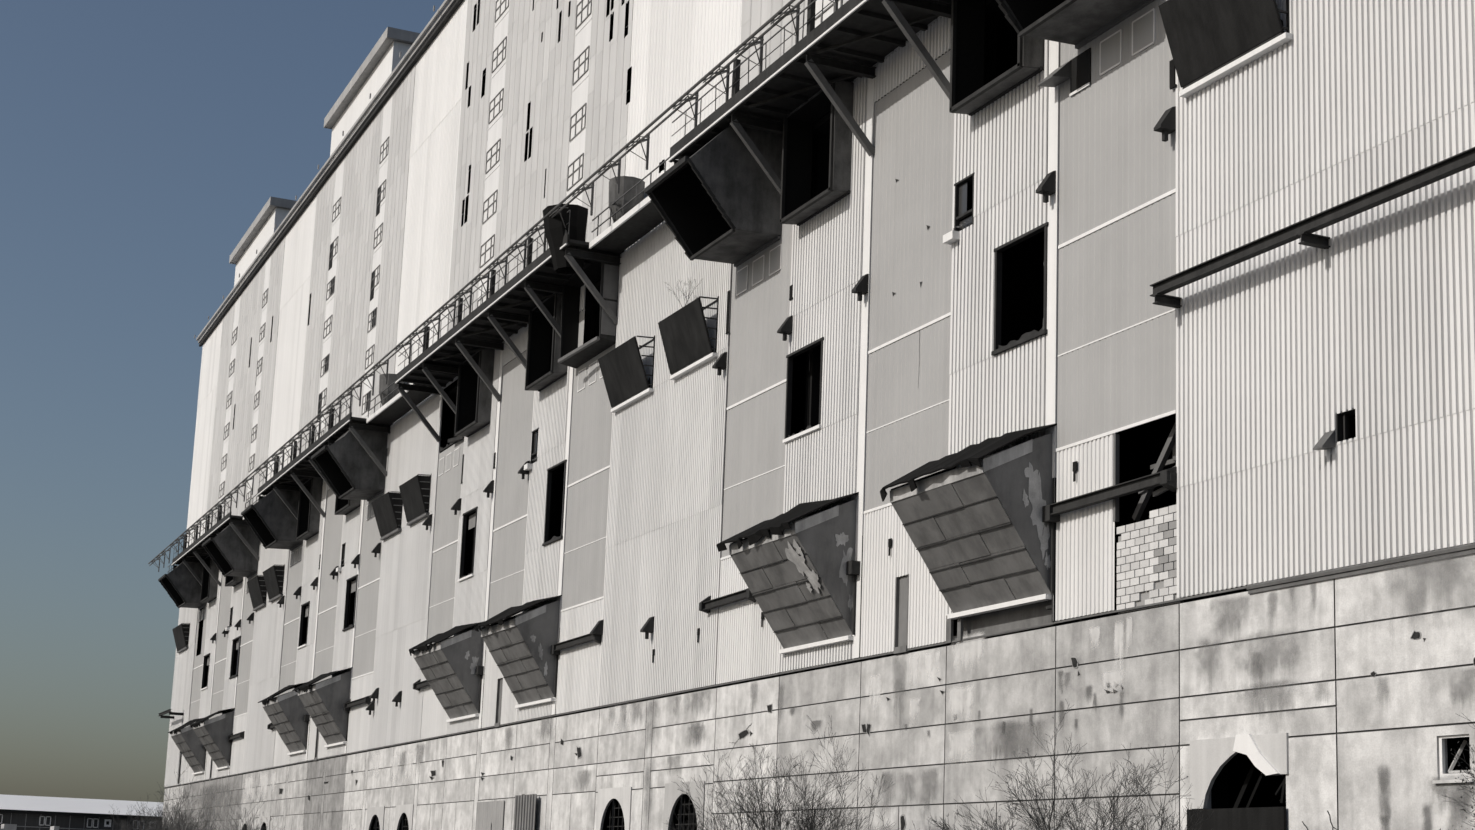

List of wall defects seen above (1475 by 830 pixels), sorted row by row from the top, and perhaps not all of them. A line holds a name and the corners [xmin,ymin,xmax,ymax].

peeling [1023,462,1051,570]
peeling [785,540,821,593]
peeling [835,532,853,611]